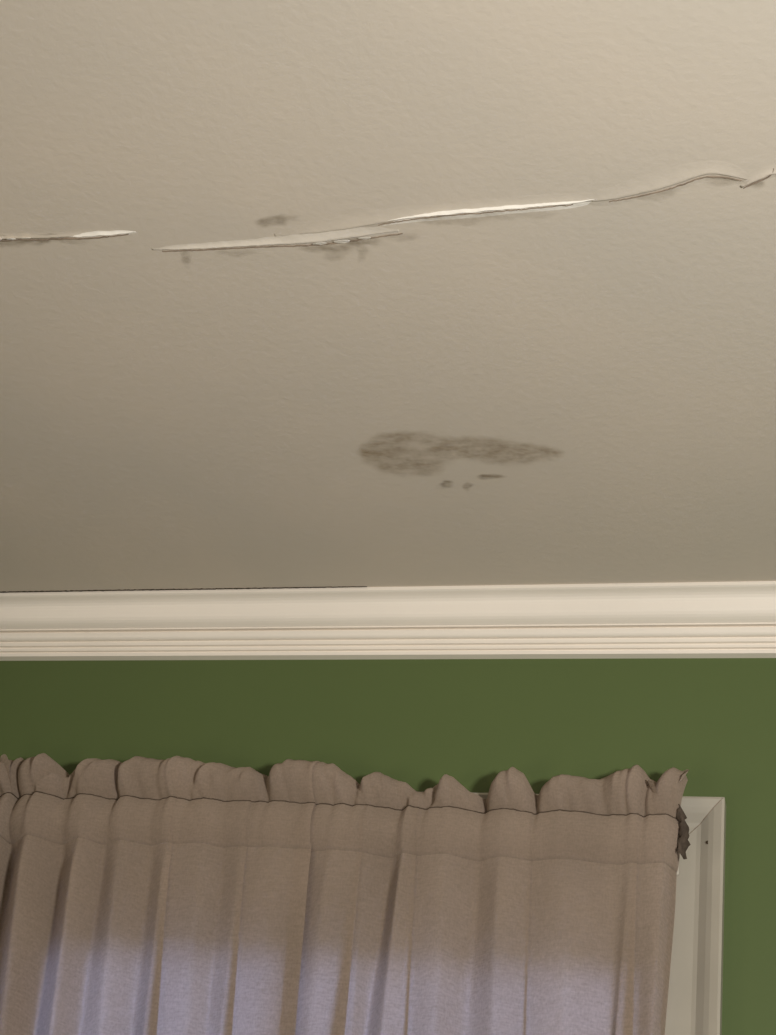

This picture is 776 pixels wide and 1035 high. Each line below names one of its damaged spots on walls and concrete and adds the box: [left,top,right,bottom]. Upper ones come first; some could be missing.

crack [0,161,776,252]